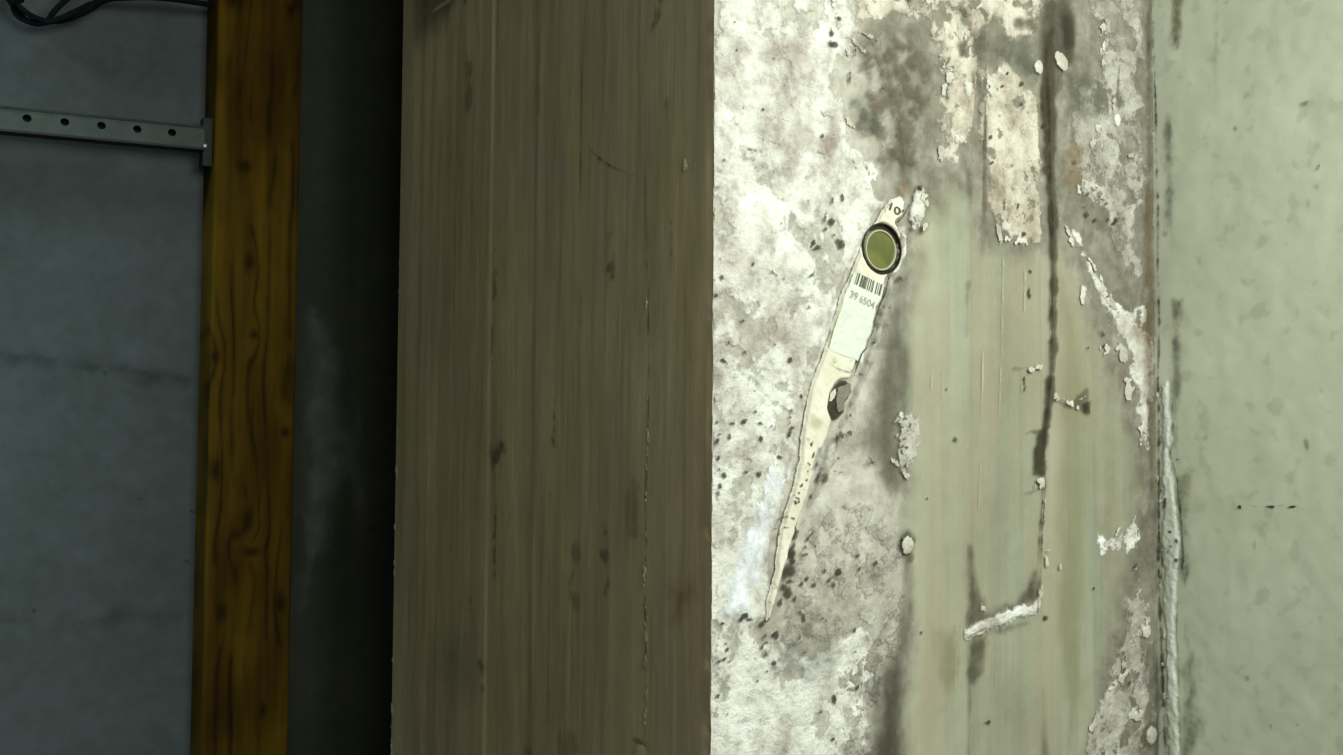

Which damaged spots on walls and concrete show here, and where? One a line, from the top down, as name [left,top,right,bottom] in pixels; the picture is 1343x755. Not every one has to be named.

water stain [711,0,1156,755]
spalling [1056,389,1090,414]